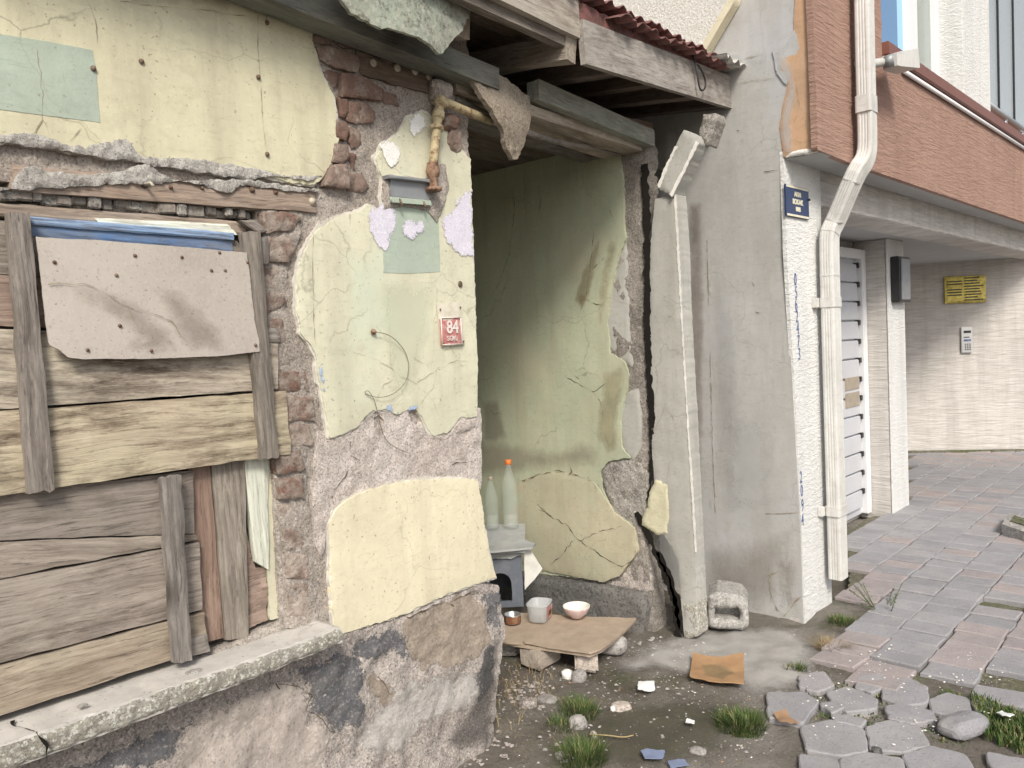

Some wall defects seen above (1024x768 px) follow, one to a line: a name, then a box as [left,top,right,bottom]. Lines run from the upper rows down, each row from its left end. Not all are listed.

flaking render [0,33,435,252]
peeling [441,189,474,256]
peeling [608,242,634,367]
spalling [310,404,482,560]
crack [537,163,682,638]
peeling [622,388,643,460]
water stain [348,649,493,761]